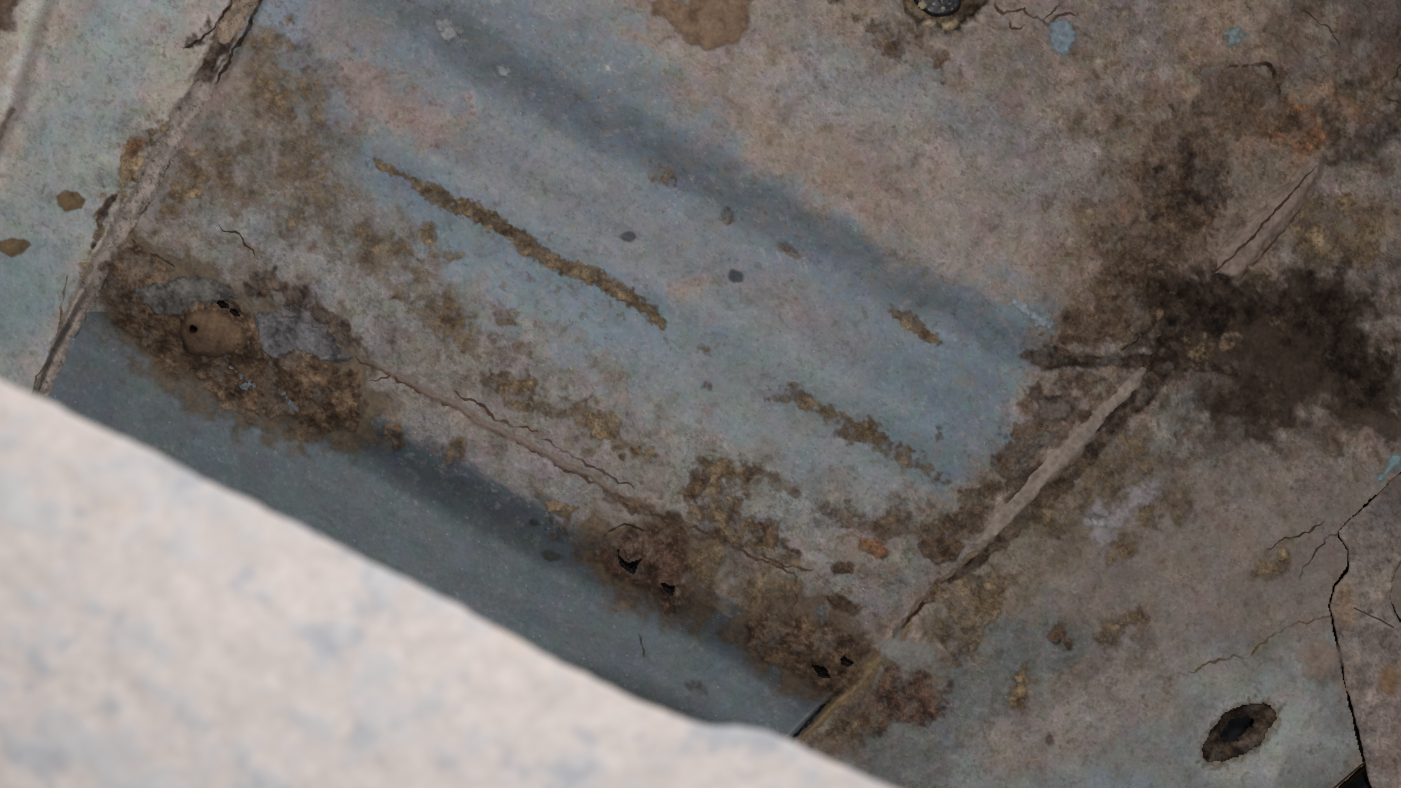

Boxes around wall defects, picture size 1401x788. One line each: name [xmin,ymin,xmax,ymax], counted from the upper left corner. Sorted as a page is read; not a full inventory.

rust [853,15,949,83]
rust [482,343,663,463]
rust [817,65,1401,738]
damp [1128,258,1401,441]
crack [356,357,811,605]
rust [604,456,801,567]
crack [1270,524,1325,561]
crack [1191,637,1268,673]
rust [1202,703,1276,762]